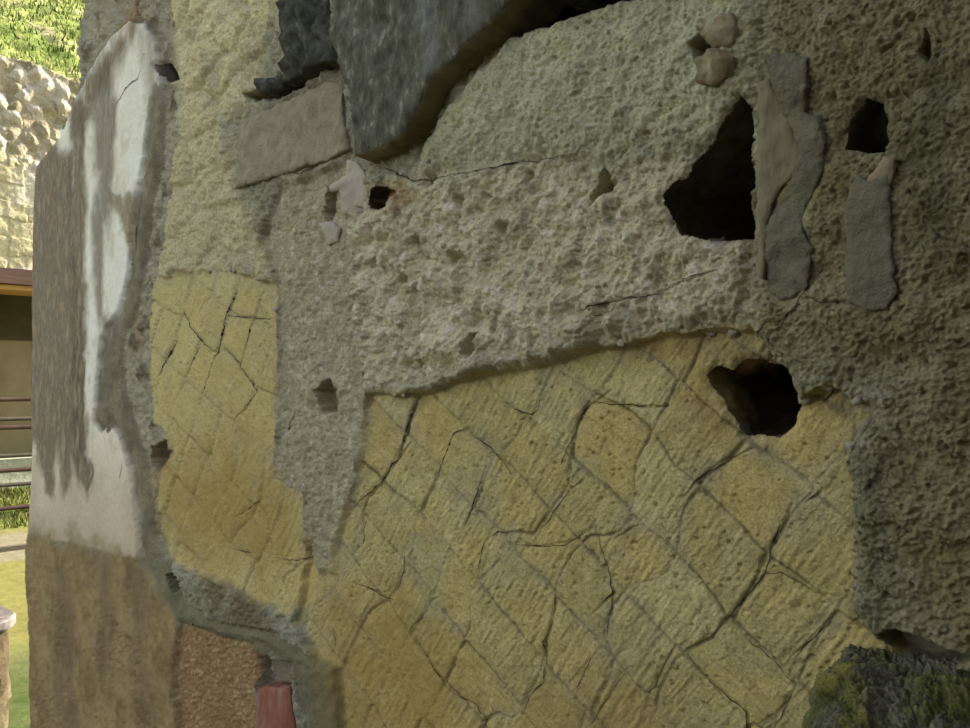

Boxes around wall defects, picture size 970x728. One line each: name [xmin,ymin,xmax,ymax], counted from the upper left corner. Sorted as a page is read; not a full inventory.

leakage [31,38,140,495]
crack [159,292,271,417]
spalling [79,0,353,615]
peeling [319,160,396,246]
peeling [663,52,828,301]
peeling [843,98,900,312]
crack [355,406,416,546]
crack [477,479,633,635]
spalling [292,329,970,728]
crack [709,486,824,639]
spalling [171,622,296,728]
crack [590,613,835,728]